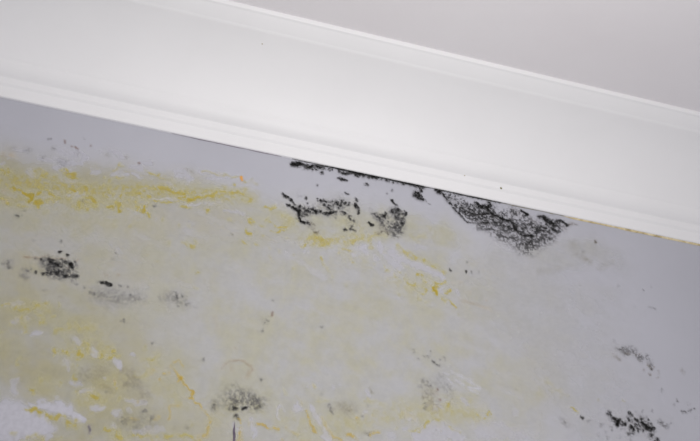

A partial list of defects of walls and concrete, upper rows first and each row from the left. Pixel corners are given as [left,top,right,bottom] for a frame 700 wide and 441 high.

leakage [0,159,606,441]
leakage [606,411,660,441]